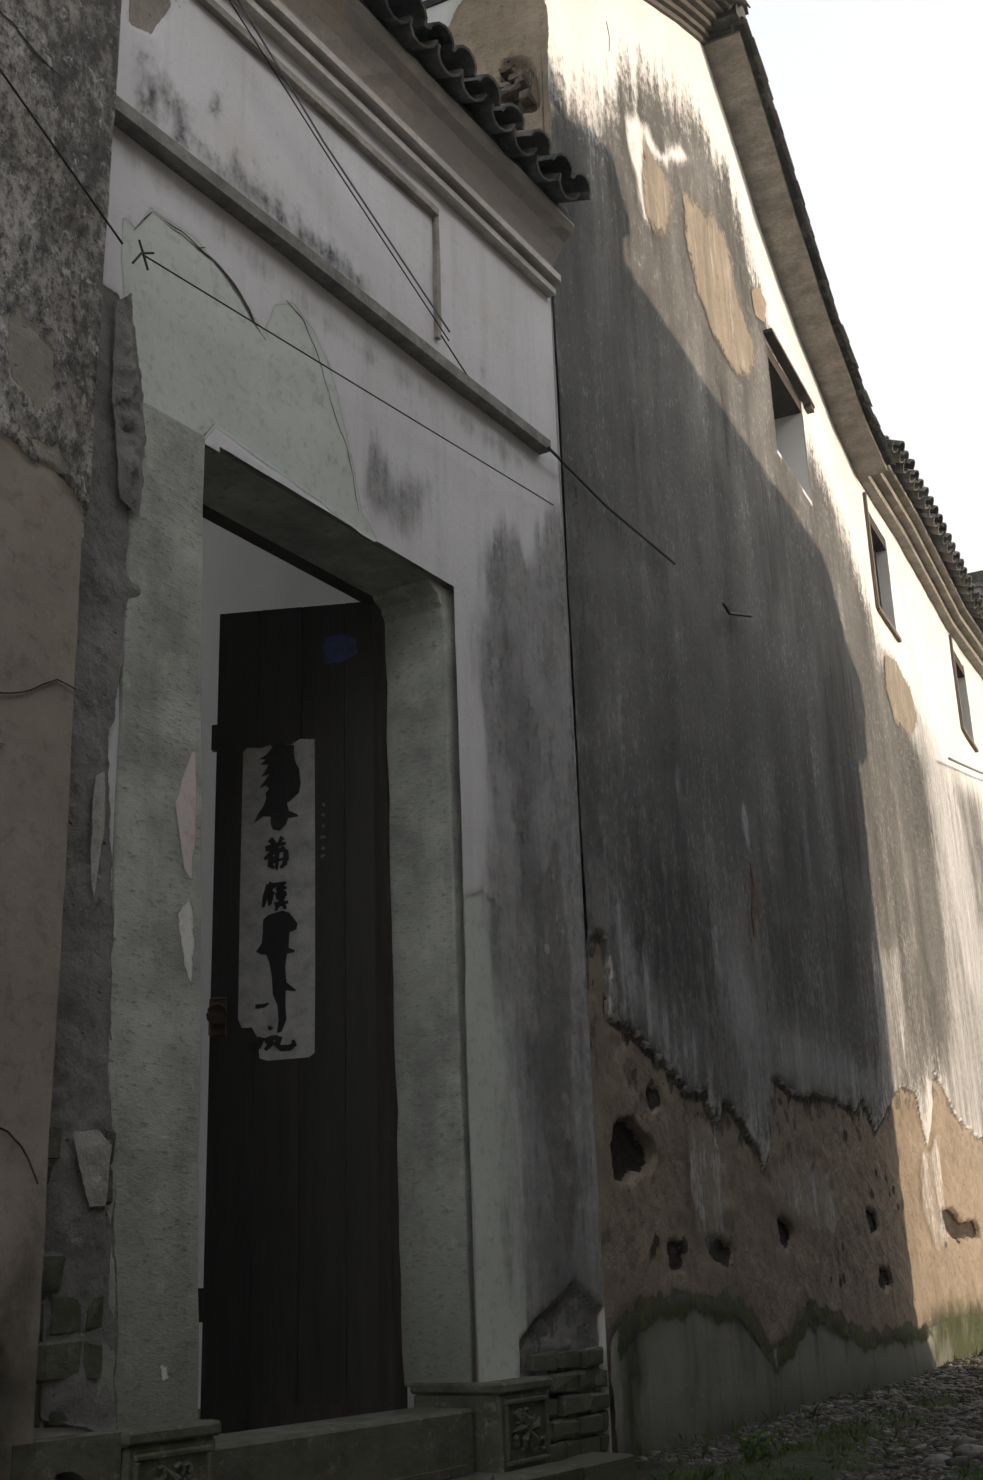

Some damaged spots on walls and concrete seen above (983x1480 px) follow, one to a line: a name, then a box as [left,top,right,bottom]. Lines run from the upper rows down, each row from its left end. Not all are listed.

peeling [129,0,179,34]
flaking render [448,0,553,154]
damp [234,169,360,285]
flaking render [626,113,766,380]
crack [0,679,76,694]
damp [483,39,983,1376]
flaking render [885,650,917,744]
flaking render [0,208,376,1480]
crack [0,1127,39,1184]
flaking render [464,890,983,1462]